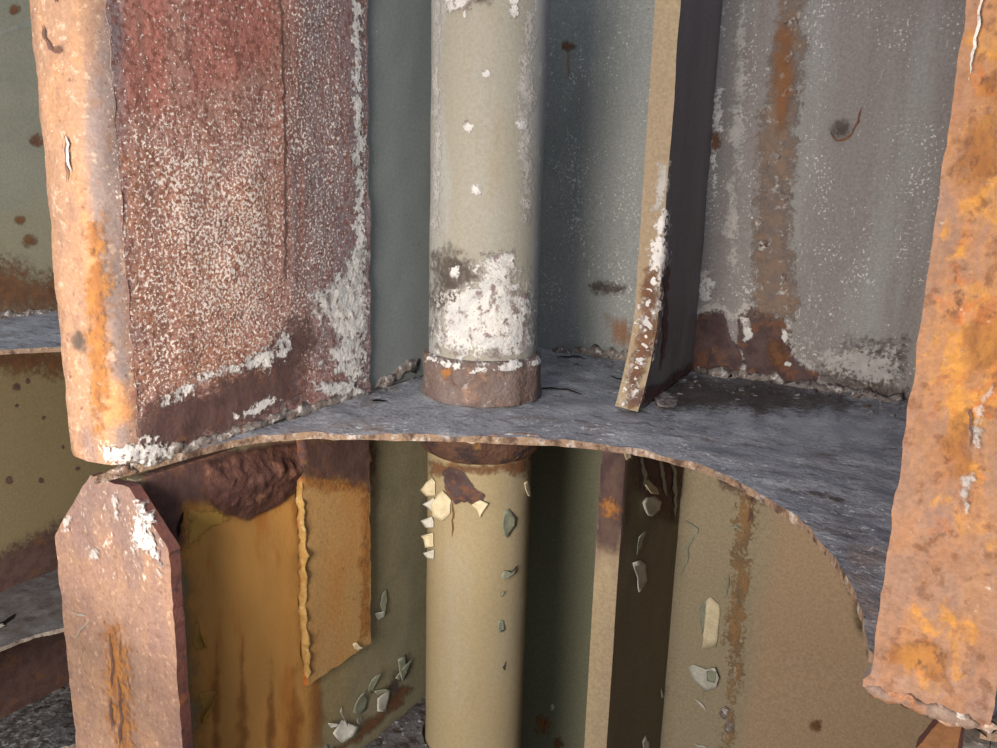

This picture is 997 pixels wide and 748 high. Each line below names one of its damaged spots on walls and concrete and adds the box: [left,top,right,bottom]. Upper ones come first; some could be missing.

efflorescence [430,0,442,235]
efflorescence [307,0,370,397]
corrosion [0,258,58,313]
corrosion [85,221,114,435]
corrosion [136,318,316,455]
efflorescence [427,249,626,392]
corrosion [614,252,693,409]
peeling [420,467,488,559]
corrosion [139,439,375,748]
peeling [699,576,729,649]
peeling [324,655,412,748]
peeling [688,665,719,710]